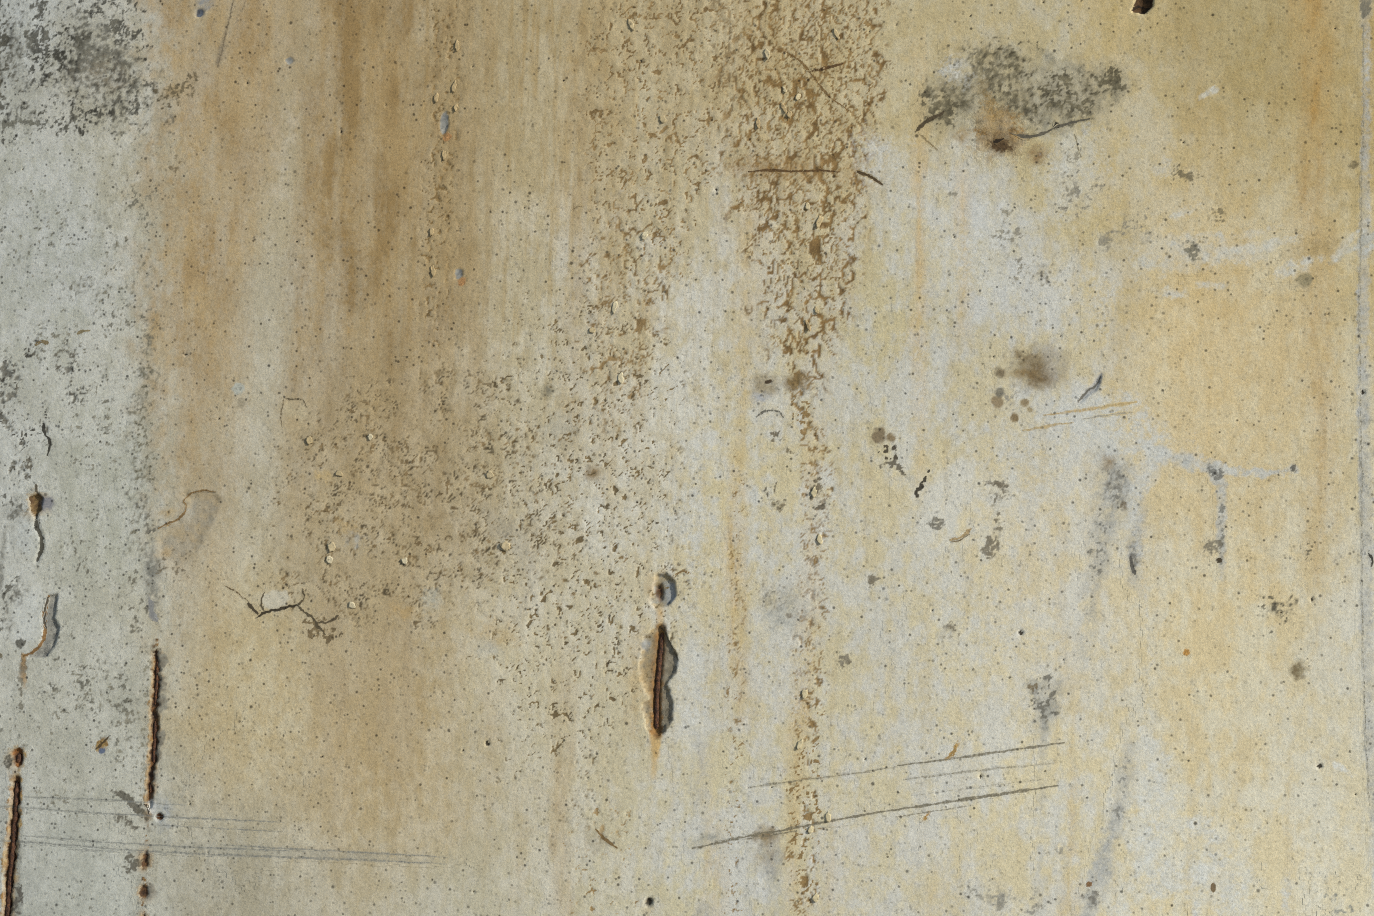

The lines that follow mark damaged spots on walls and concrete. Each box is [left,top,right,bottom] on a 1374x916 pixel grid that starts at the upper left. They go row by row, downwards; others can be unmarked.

water stain [454,0,585,363]
corrosion [0,657,34,916]
peeling [0,319,101,691]
corrosion [113,831,160,916]
corrosion [131,637,173,801]
water stain [0,0,486,916]
crack [224,585,346,651]
peeling [261,0,917,916]
water stain [662,0,1374,916]